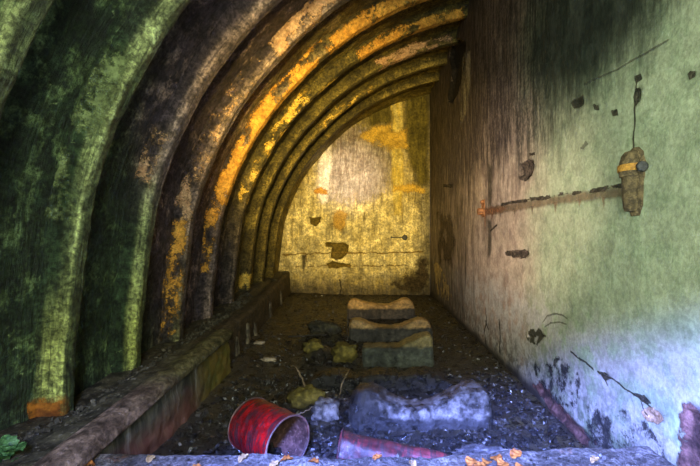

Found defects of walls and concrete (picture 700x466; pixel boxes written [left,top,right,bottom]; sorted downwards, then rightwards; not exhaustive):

peeling [356,8,466,103]
leakage [460,52,471,121]
leakage [532,0,657,105]
crack [584,40,668,85]
peeling [200,0,428,273]
spalling [518,152,535,181]
corrosion [484,189,622,220]
spalling [505,249,528,259]
crack [543,313,567,327]
leakage [534,356,580,408]
crack [570,351,652,416]
spalling [676,402,700,466]